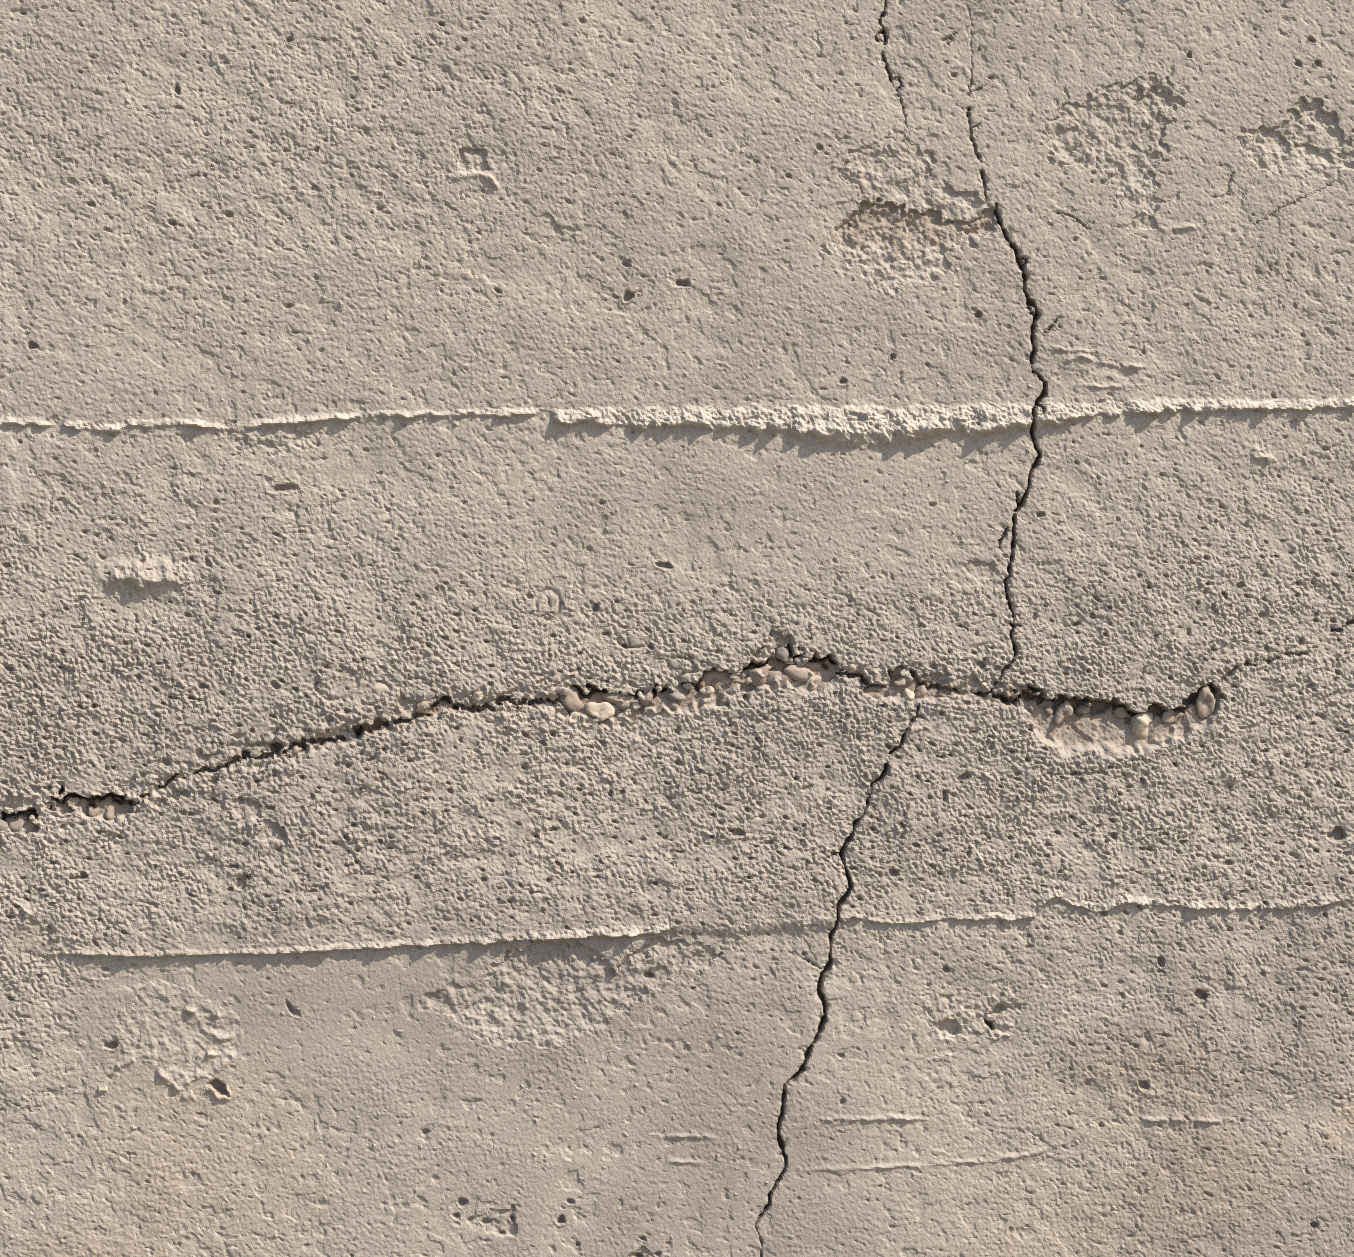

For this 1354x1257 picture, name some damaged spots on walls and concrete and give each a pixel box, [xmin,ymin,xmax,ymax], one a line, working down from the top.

crack [1054,210,1093,232]
crack [1210,170,1237,201]
crack [1253,180,1354,227]
crack [0,0,1060,1257]
crack [1220,619,1354,684]
crack [1047,758,1142,779]